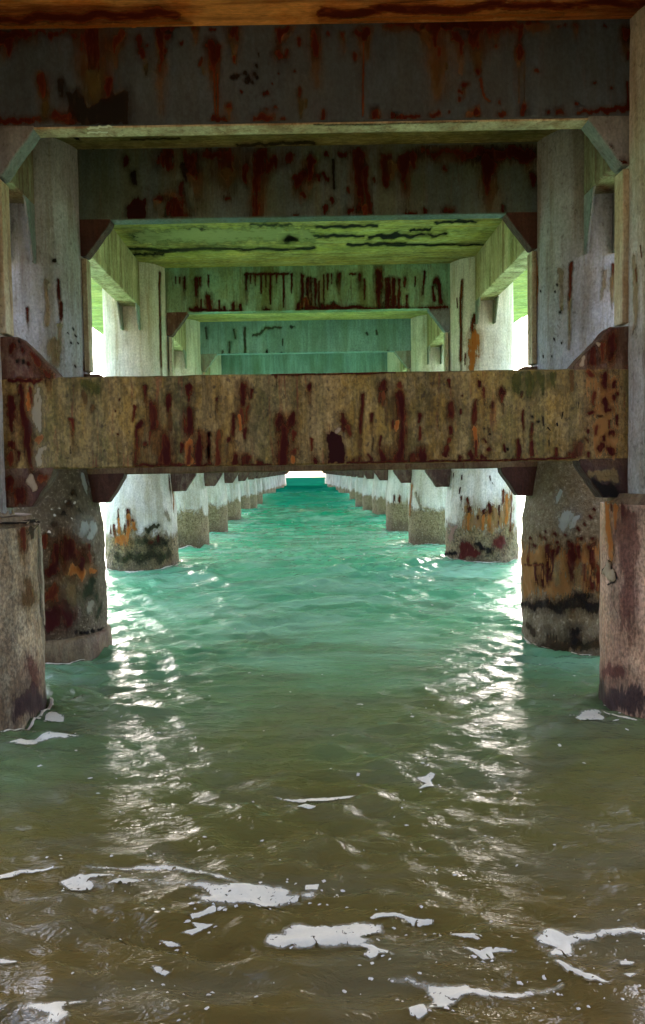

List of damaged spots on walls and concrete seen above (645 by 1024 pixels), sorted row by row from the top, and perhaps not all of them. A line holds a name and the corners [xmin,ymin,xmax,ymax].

corrosion [0,5,196,126]
corrosion [198,27,239,123]
corrosion [274,0,645,119]
corrosion [123,144,537,219]
corrosion [175,274,242,312]
corrosion [5,278,63,471]
corrosion [132,382,318,521]
corrosion [244,262,626,602]
corrosion [20,525,97,635]
corrosion [110,508,138,547]